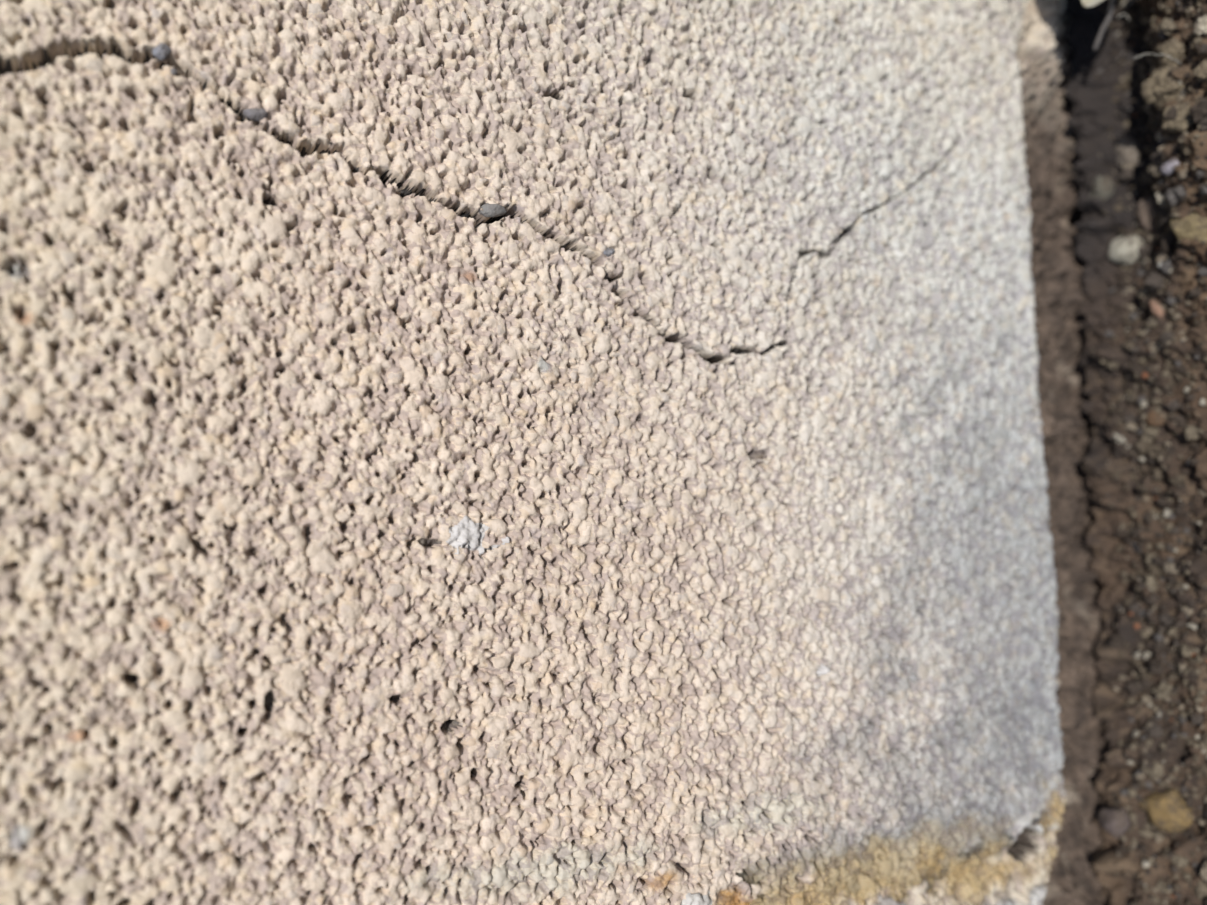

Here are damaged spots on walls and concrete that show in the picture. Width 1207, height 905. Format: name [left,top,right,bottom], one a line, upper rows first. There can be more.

crack [0,41,621,298]
crack [644,197,890,381]